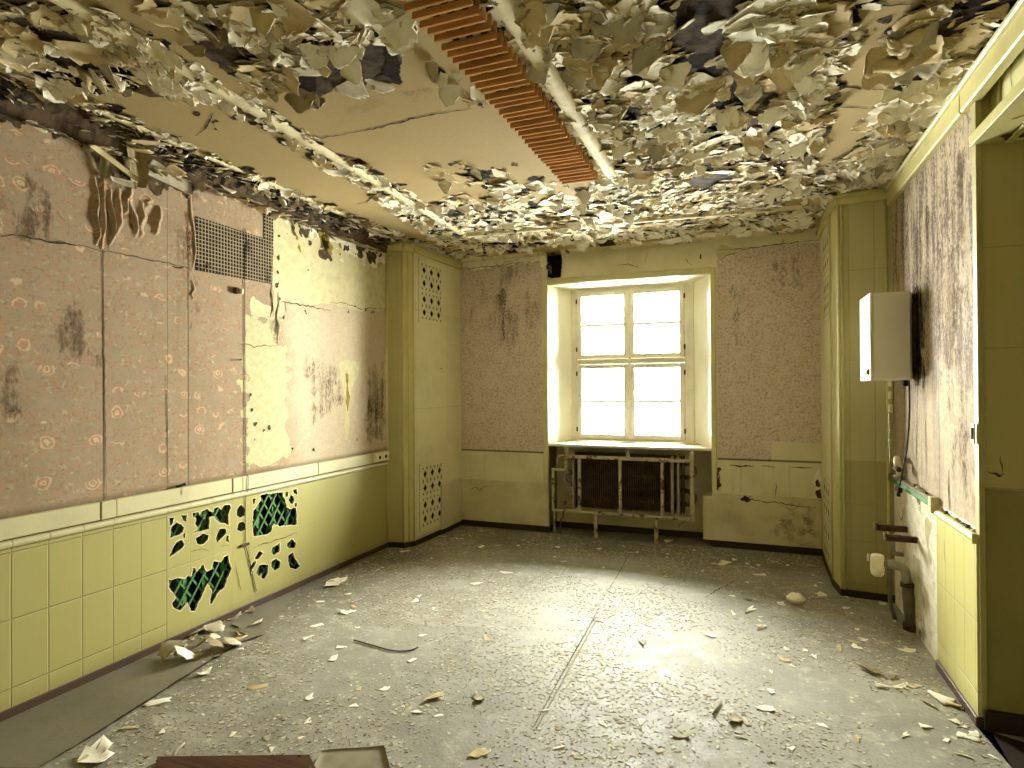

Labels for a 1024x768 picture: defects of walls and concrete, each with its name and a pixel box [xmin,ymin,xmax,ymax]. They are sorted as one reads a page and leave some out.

crack [1,234,187,498]
spalling [168,488,300,612]
peeling [0,0,1017,469]
crack [730,465,816,510]